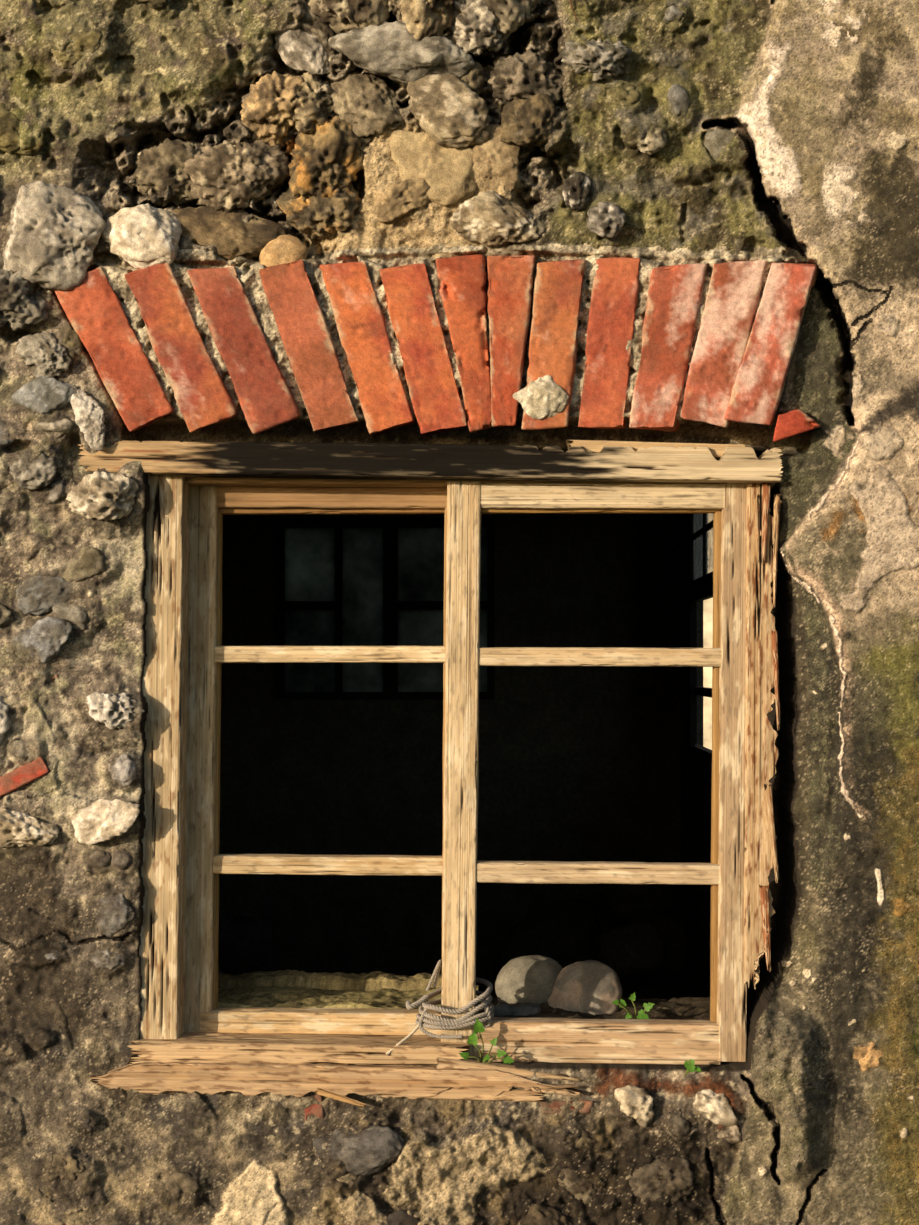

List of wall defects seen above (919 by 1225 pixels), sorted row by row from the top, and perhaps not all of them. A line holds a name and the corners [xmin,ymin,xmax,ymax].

crack [702,118,893,426]
flaking render [781,285,919,899]
crack [705,1147,727,1225]
crack [741,1074,827,1225]